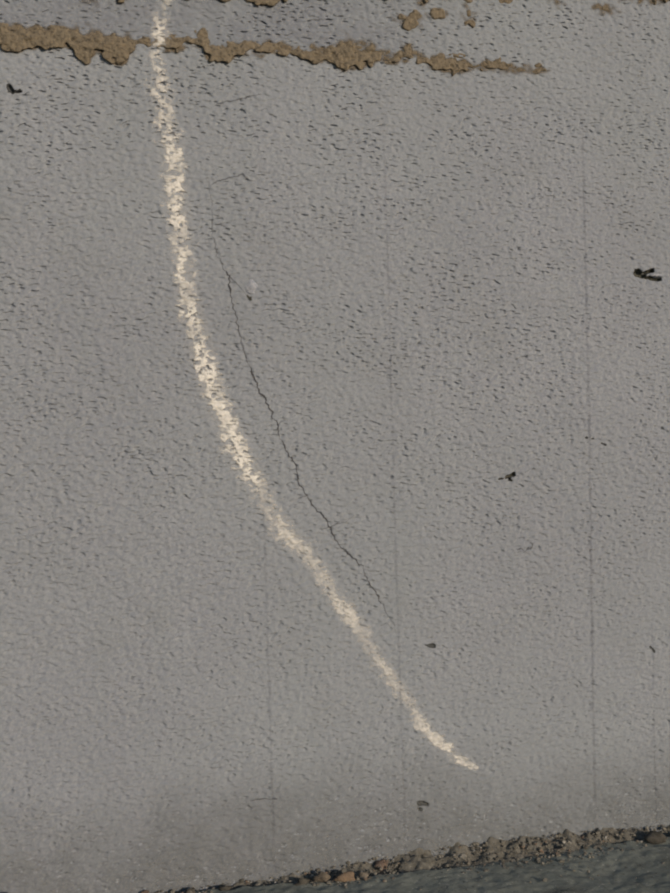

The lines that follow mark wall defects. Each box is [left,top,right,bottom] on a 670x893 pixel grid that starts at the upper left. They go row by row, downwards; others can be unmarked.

flaking render [397,0,448,31]
flaking render [464,0,476,28]
flaking render [592,3,611,14]
flaking render [0,23,547,76]
crack [251,368,382,604]